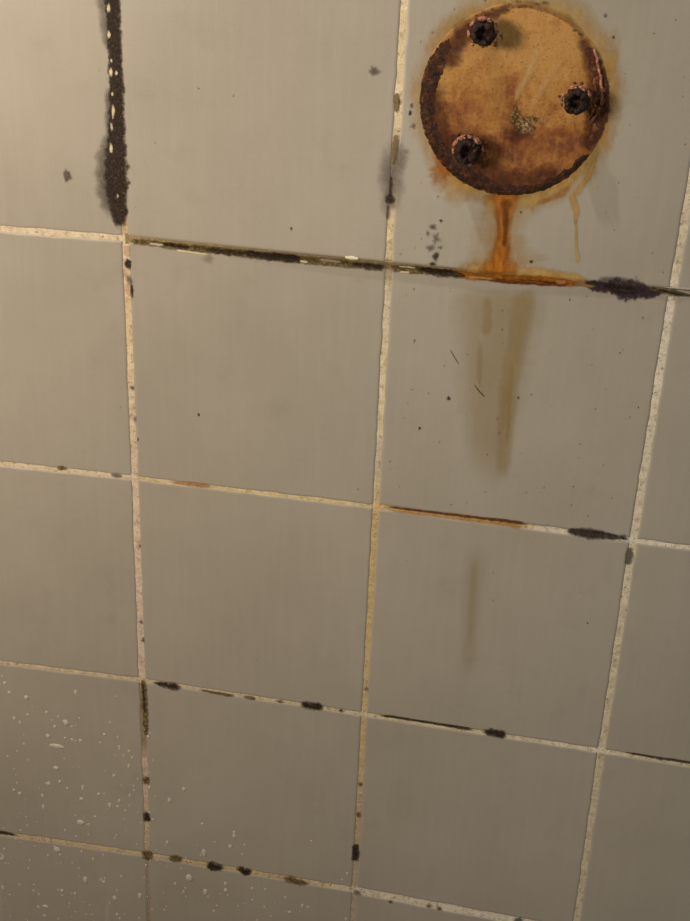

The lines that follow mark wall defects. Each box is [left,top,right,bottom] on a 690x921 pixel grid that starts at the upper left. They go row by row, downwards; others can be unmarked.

damp [99,0,130,225]
corrosion [423,0,615,287]
damp [133,220,465,278]
damp [585,278,690,302]
corrosion [391,507,524,525]
damp [568,528,633,564]
damp [383,715,470,730]
damp [484,728,505,738]
damp [627,752,690,764]